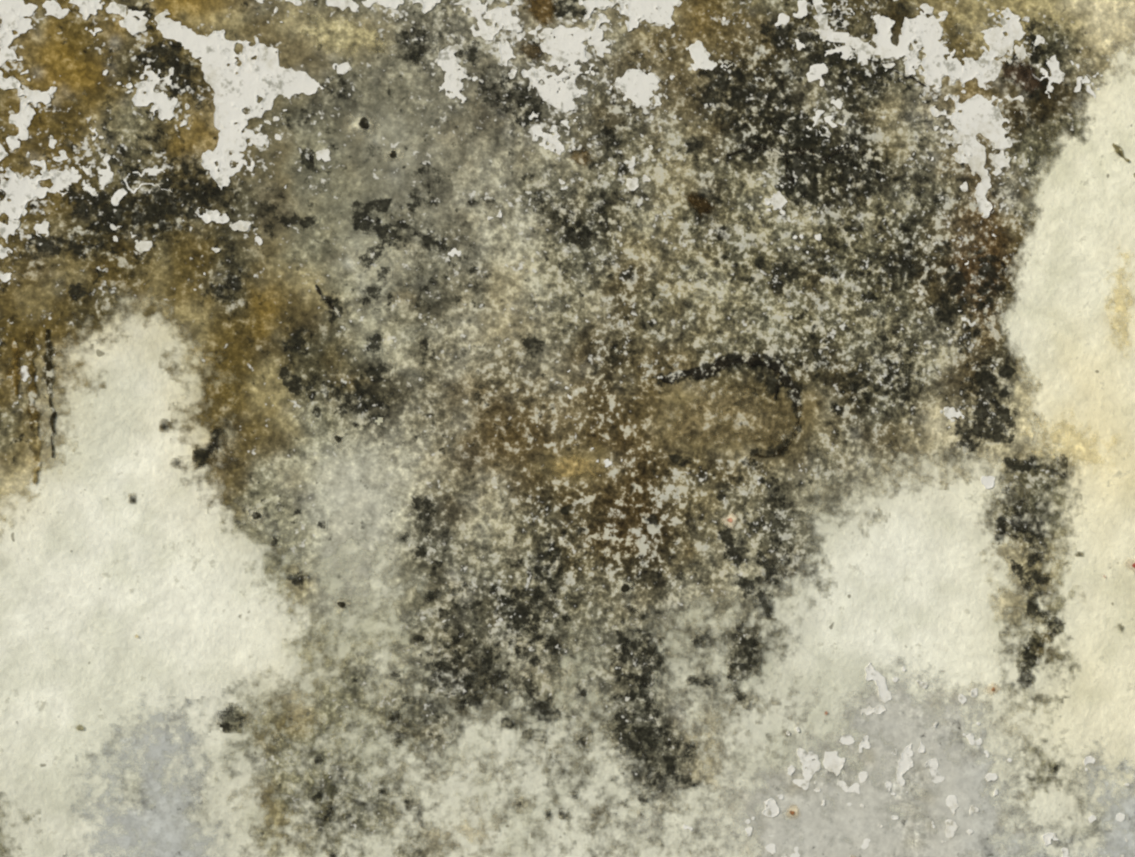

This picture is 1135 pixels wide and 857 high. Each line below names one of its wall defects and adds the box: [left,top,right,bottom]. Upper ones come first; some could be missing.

peeling [0,0,324,259]
peeling [301,0,682,155]
damp [520,42,542,61]
peeling [686,40,733,71]
peeling [775,0,1103,218]
damp [1013,38,1028,55]
peeling [759,182,787,219]
mould [991,570,1042,638]
mould [1003,630,1047,673]
mould [217,704,245,733]
peeling [787,734,871,807]
mould [376,761,460,857]